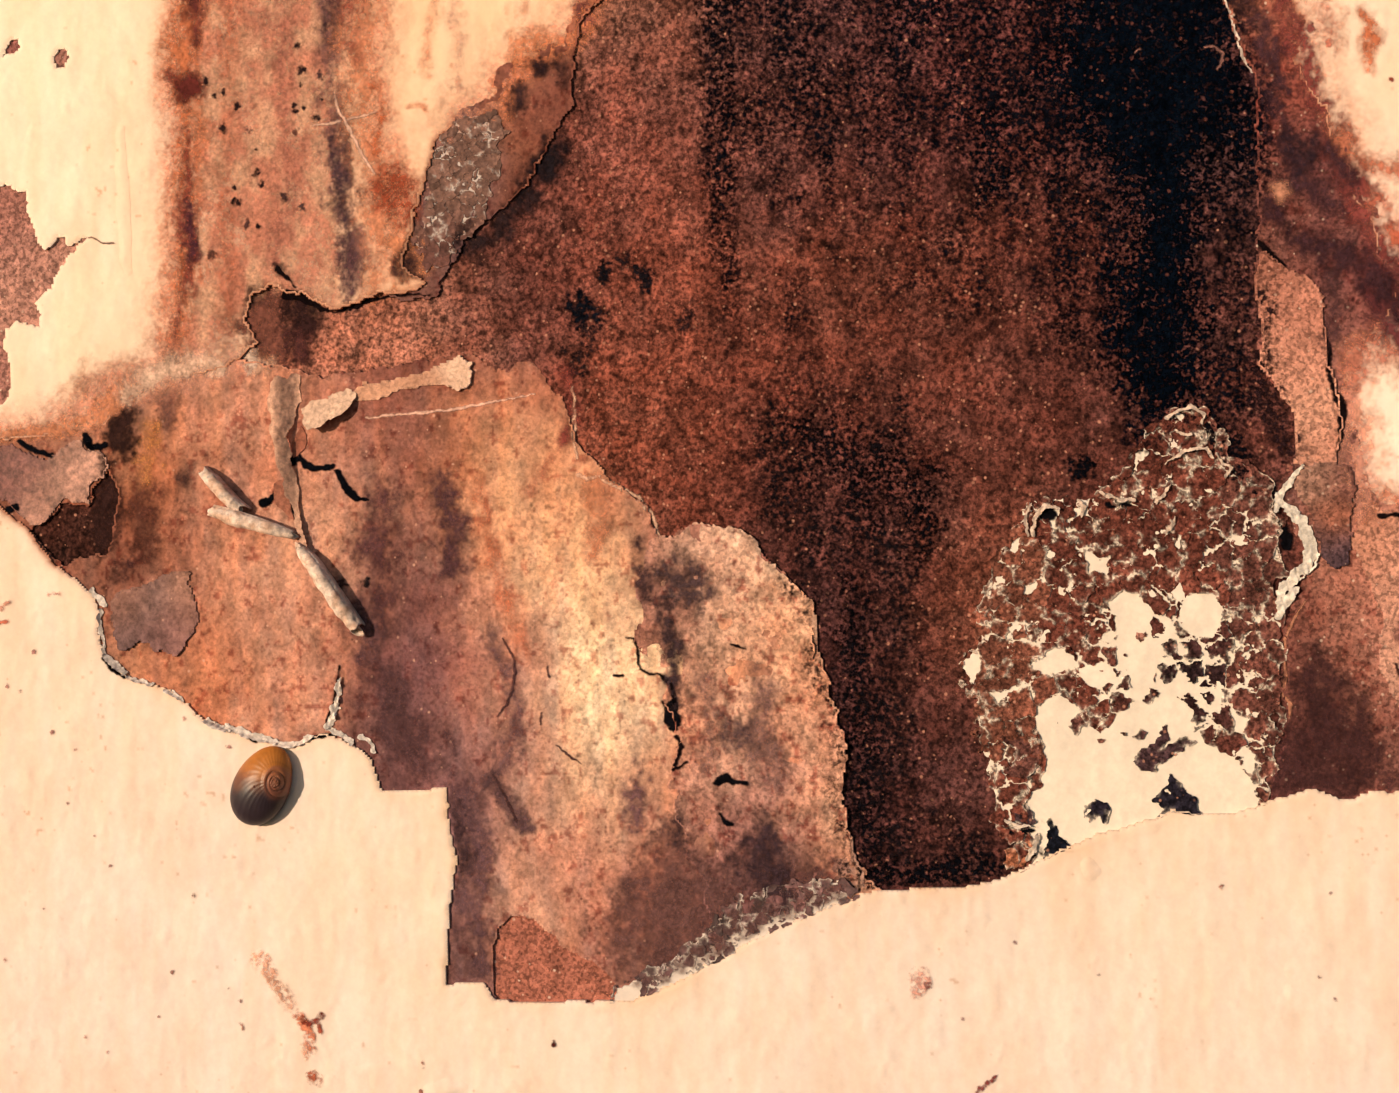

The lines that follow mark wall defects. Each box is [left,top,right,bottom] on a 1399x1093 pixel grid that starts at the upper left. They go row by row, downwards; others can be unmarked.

rust [451,1,596,118]
peeling [0,185,86,404]
crack [274,266,430,313]
rust [1274,0,1399,523]
peeling [198,373,365,636]
rust [557,368,579,447]
peeling [1030,503,1060,537]
peeling [1165,446,1214,464]
crack [1377,511,1399,519]
crack [612,637,688,771]
peeling [610,873,858,1002]
rust [253,952,325,1082]